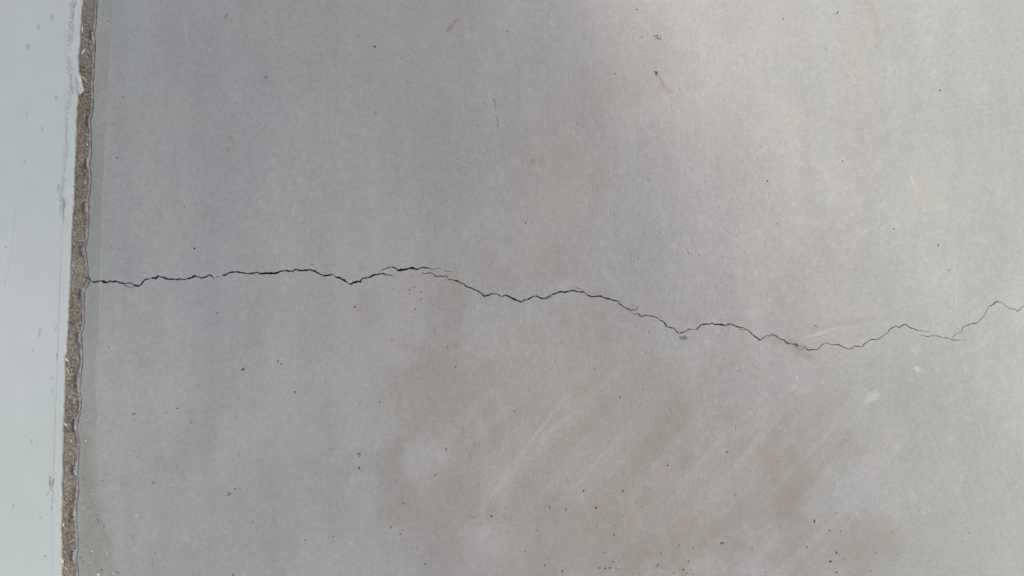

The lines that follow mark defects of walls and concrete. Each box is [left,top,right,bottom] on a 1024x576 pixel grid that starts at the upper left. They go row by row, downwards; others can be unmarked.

crack [87,267,1024,351]